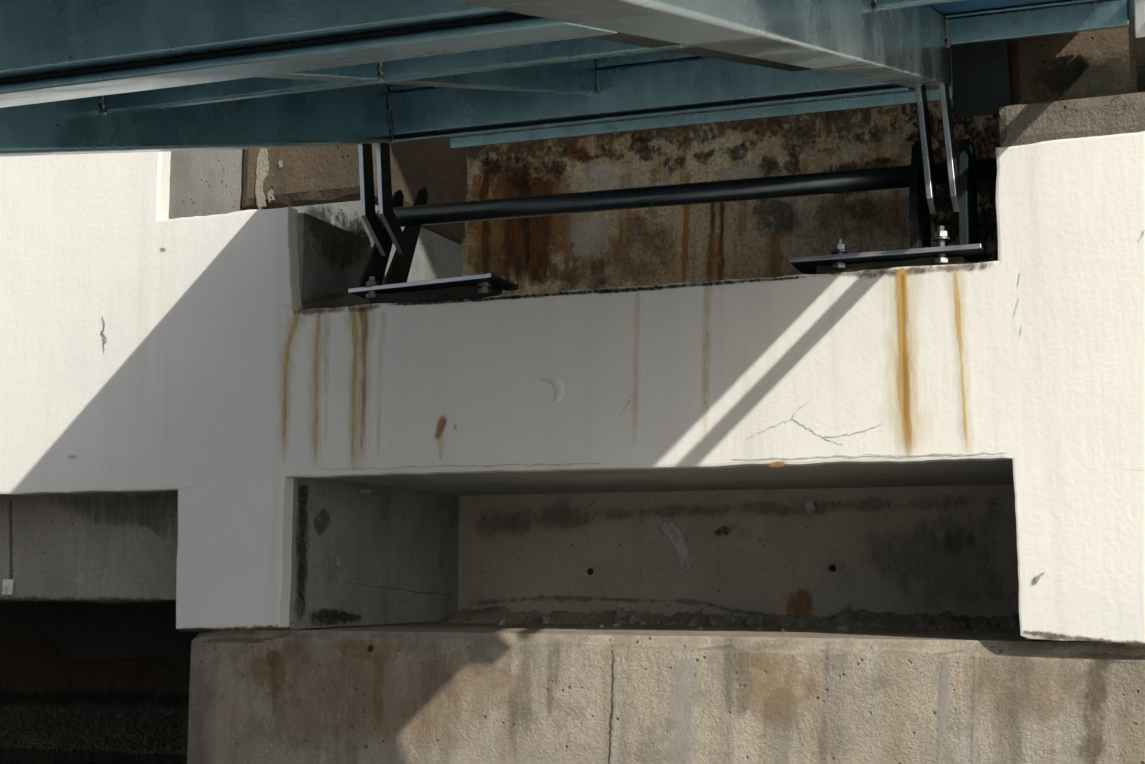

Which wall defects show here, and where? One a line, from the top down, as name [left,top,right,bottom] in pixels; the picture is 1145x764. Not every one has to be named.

corrosion [474,159,570,201]
corrosion [469,214,605,293]
corrosion [707,202,724,280]
corrosion [283,304,373,434]
corrosion [897,269,909,436]
corrosion [955,273,967,436]
corrosion [436,418,446,458]
crack [301,462,600,470]
crack [731,402,1003,460]
spalling [441,606,1020,634]